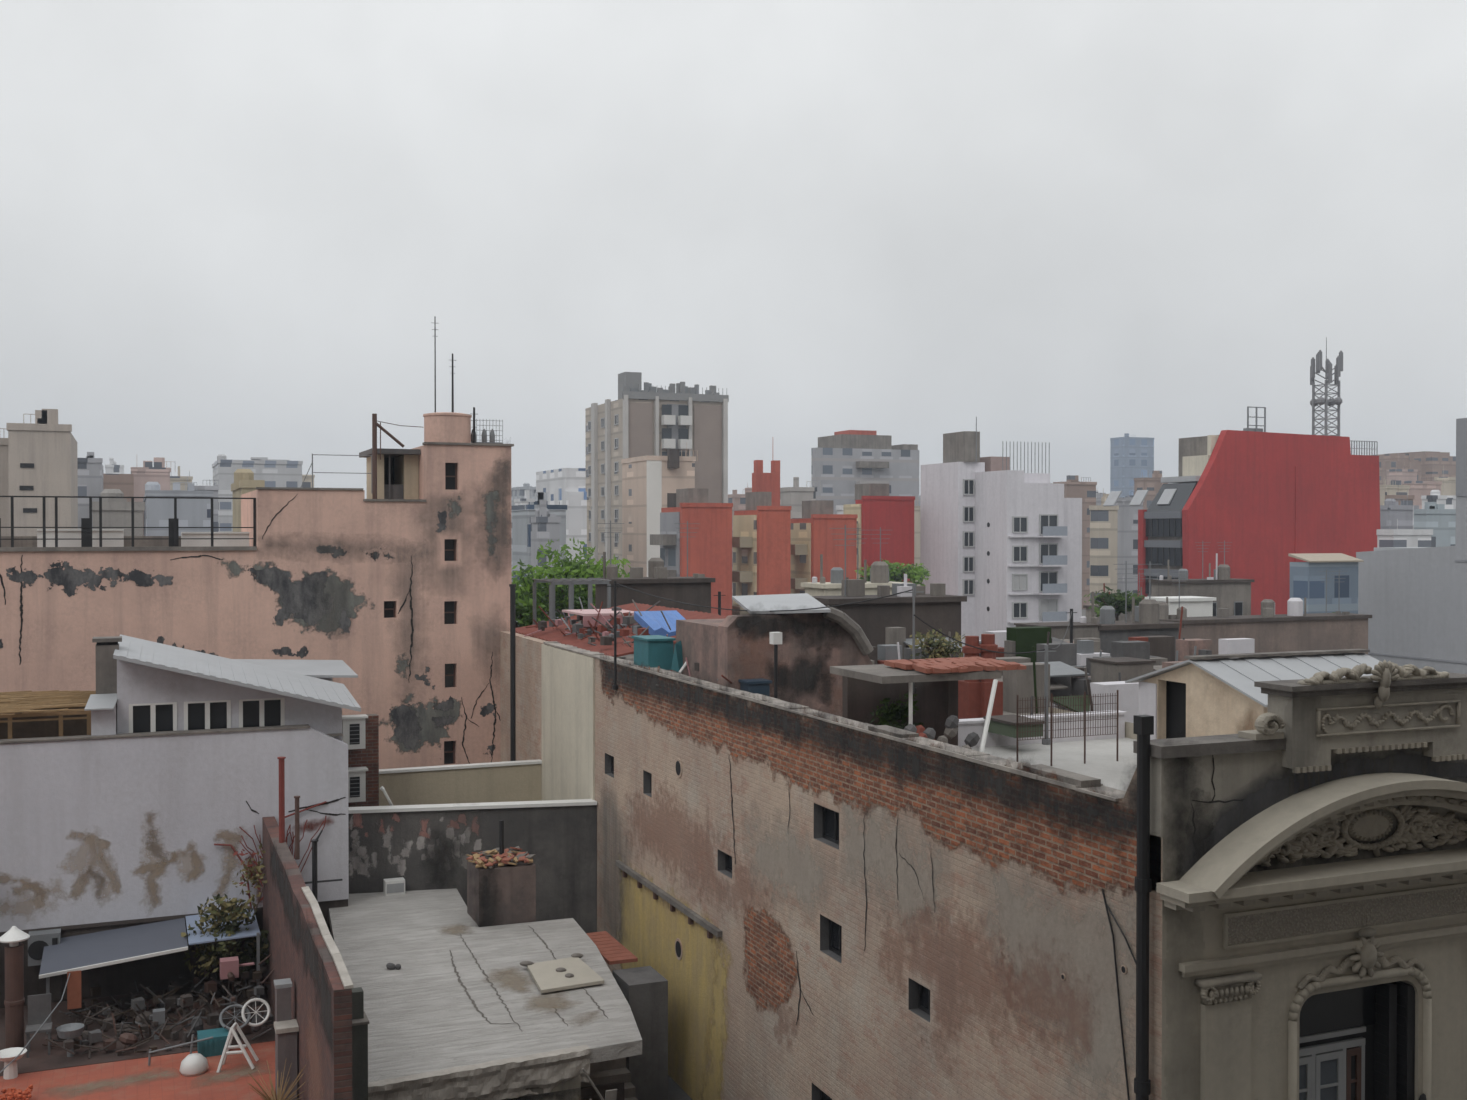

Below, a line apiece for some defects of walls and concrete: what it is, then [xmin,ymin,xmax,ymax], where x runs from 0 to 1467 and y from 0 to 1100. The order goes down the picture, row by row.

crack [262,495,297,539]
crack [0,555,23,665]
peeling [6,560,173,597]
peeling [247,545,375,658]
crack [398,556,414,683]
peeling [379,654,462,753]
peeling [480,703,497,717]
flaking render [601,657,1137,895]
crack [863,813,935,951]
crack [449,929,521,1030]
crack [554,988,608,1026]
spalling [744,907,797,1011]